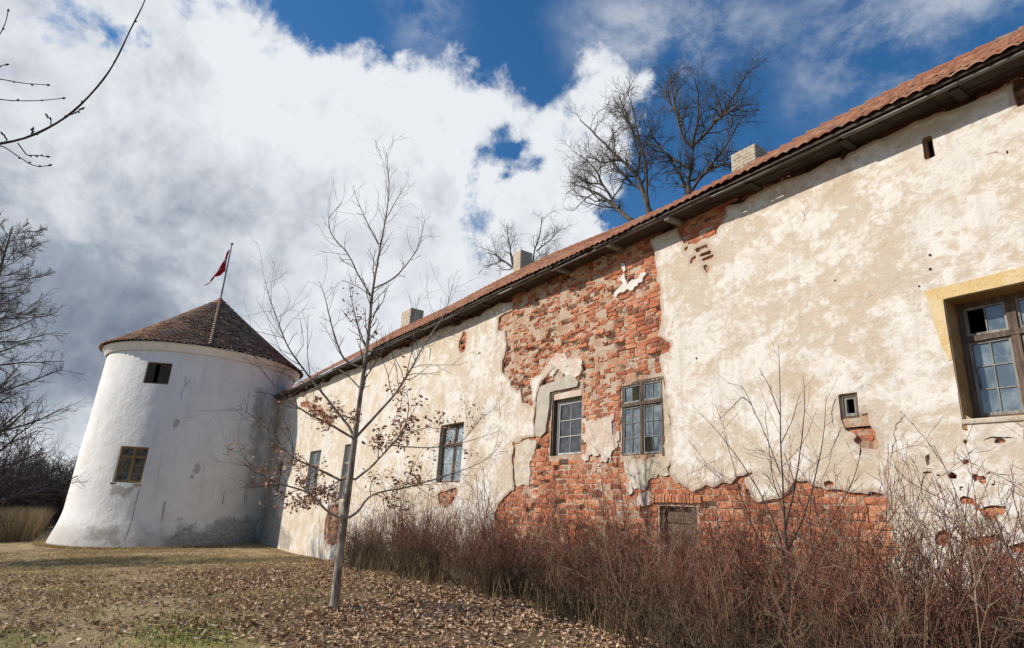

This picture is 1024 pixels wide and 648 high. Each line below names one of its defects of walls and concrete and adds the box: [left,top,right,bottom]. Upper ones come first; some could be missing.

flaking render [495,192,901,624]
flaking render [439,488,458,506]
flaking render [325,504,339,545]